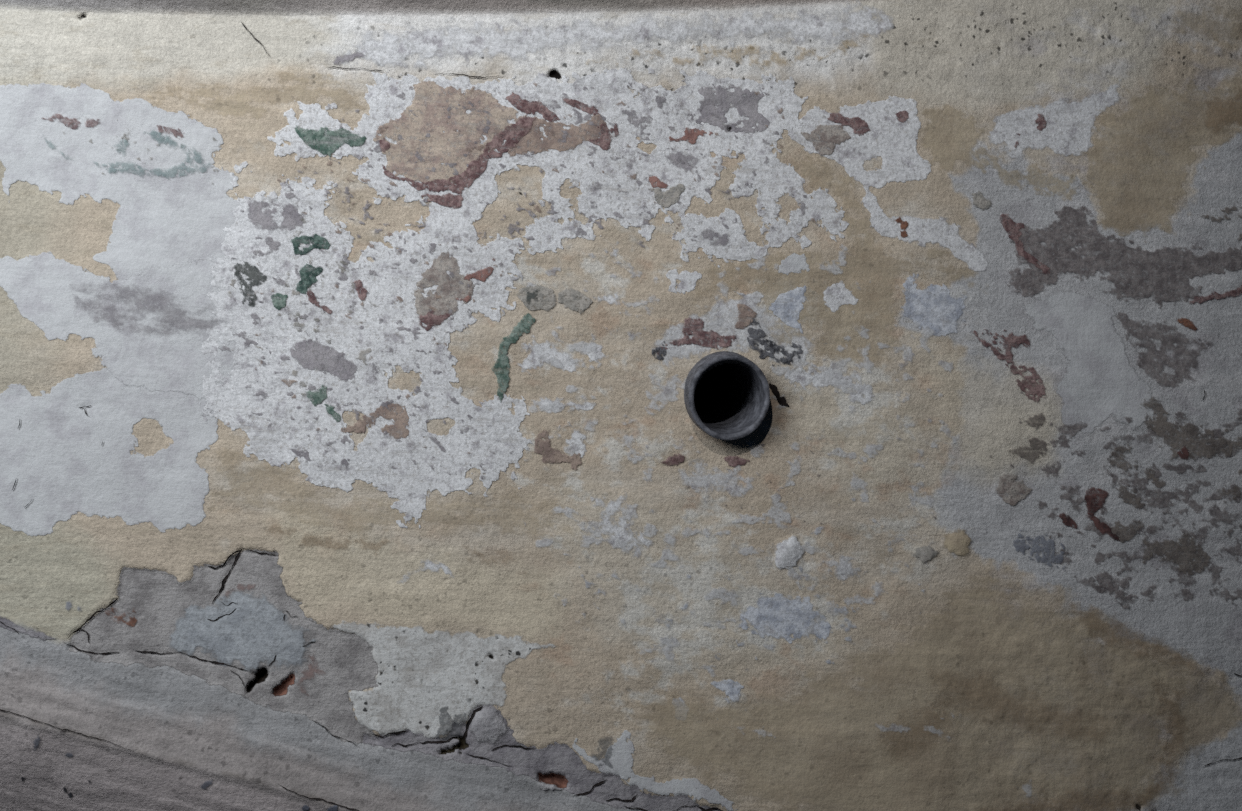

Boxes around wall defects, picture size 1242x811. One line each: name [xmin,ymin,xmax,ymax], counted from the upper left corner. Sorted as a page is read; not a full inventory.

water stain [1088,78,1242,236]
peeling [0,2,990,537]
peeling [1023,291,1155,434]
peeling [553,437,813,578]
crack [0,709,130,750]
crack [67,598,276,685]
crack [208,548,275,621]
spalling [68,549,737,811]
crack [312,706,534,766]
crack [573,779,722,811]
peeling [683,527,882,659]
water stain [648,579,1172,811]